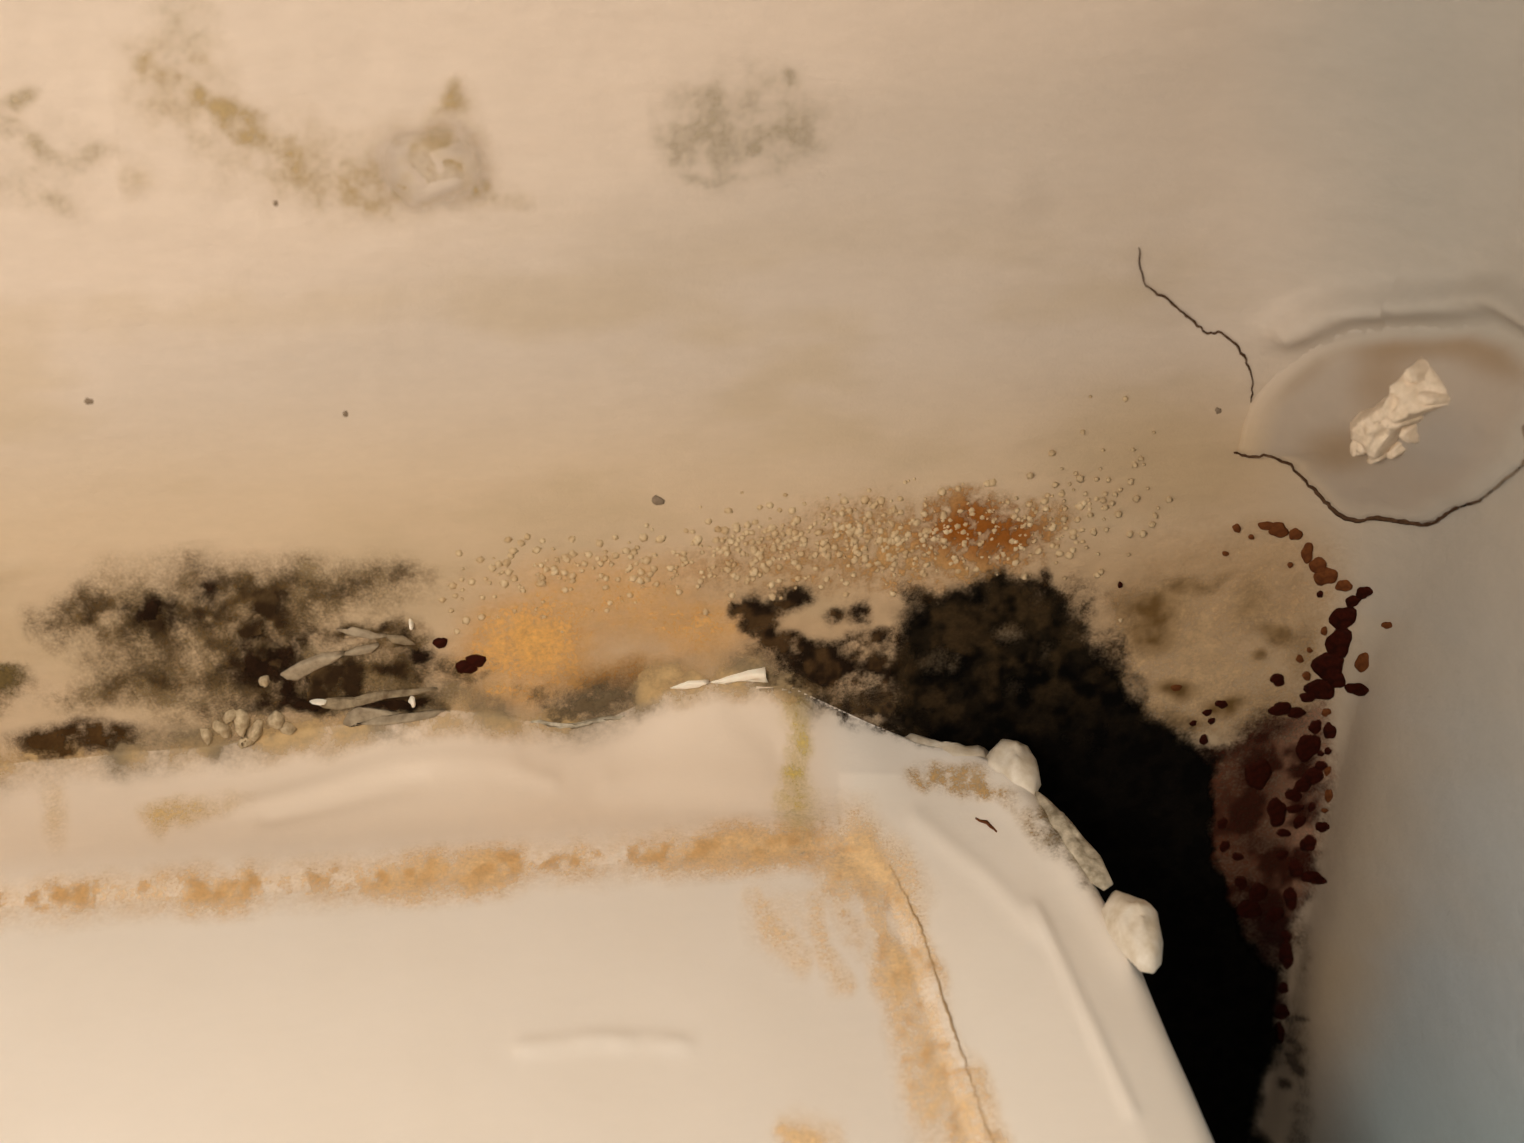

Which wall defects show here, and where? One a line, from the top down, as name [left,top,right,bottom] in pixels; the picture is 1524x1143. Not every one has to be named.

leakage [194,88,265,143]
crack [1138,247,1253,402]
crack [1234,425,1524,527]
peeling [258,619,415,688]
spalling [200,708,298,749]
peeling [309,687,446,727]
leakage [0,448,1373,1143]
rust [1198,702,1333,1013]